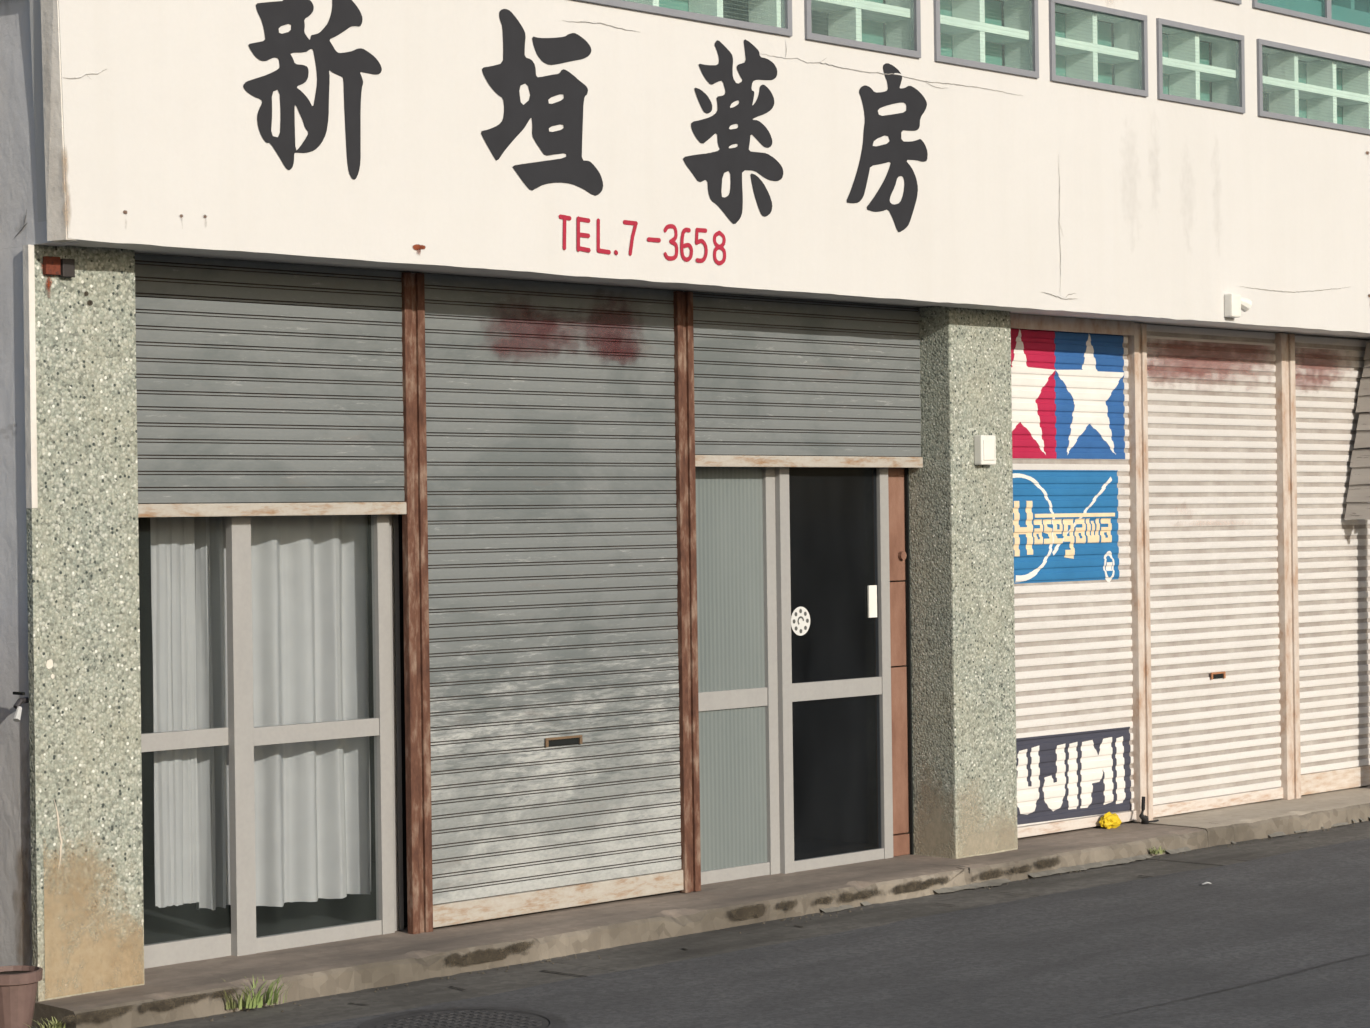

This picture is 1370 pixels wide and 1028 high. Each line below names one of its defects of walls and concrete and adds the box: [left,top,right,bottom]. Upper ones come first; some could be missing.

crack [760,41,1023,96]
damp [114,947,139,987]